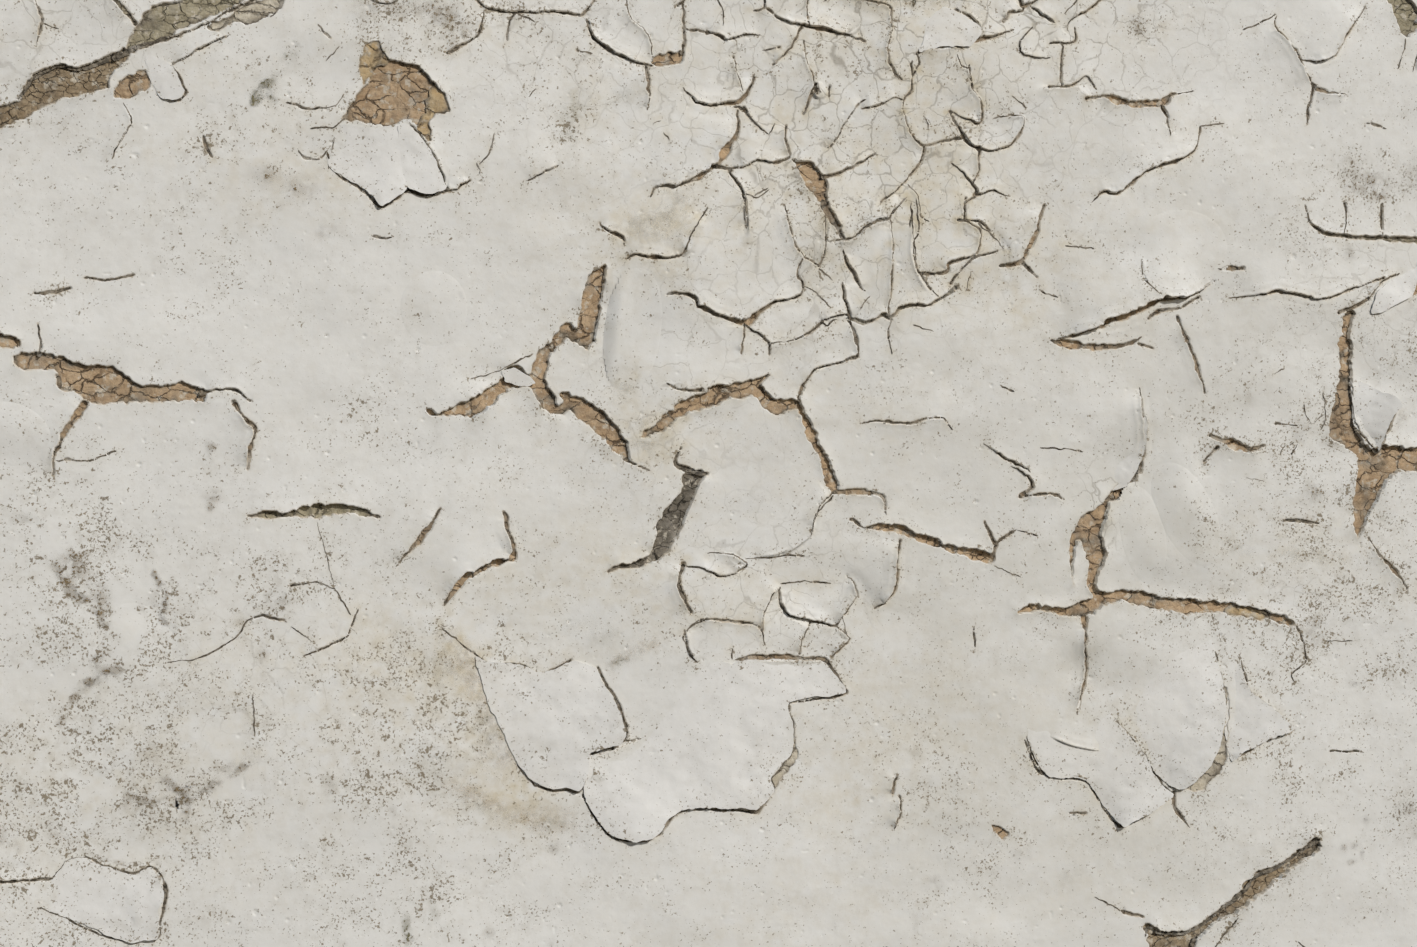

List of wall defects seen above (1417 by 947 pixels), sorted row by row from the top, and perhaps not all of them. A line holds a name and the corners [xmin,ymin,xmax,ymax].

peeling [0,0,284,128]
peeling [328,41,450,208]
crack [409,122,495,193]
crack [448,0,1224,363]
crack [1243,7,1365,125]
crack [1051,203,1417,393]
peeling [0,324,257,475]
peeling [426,266,1038,577]
peeling [1329,311,1417,594]
peeling [1018,463,1307,715]
peeling [1026,639,1296,828]
peeling [1143,838,1320,947]